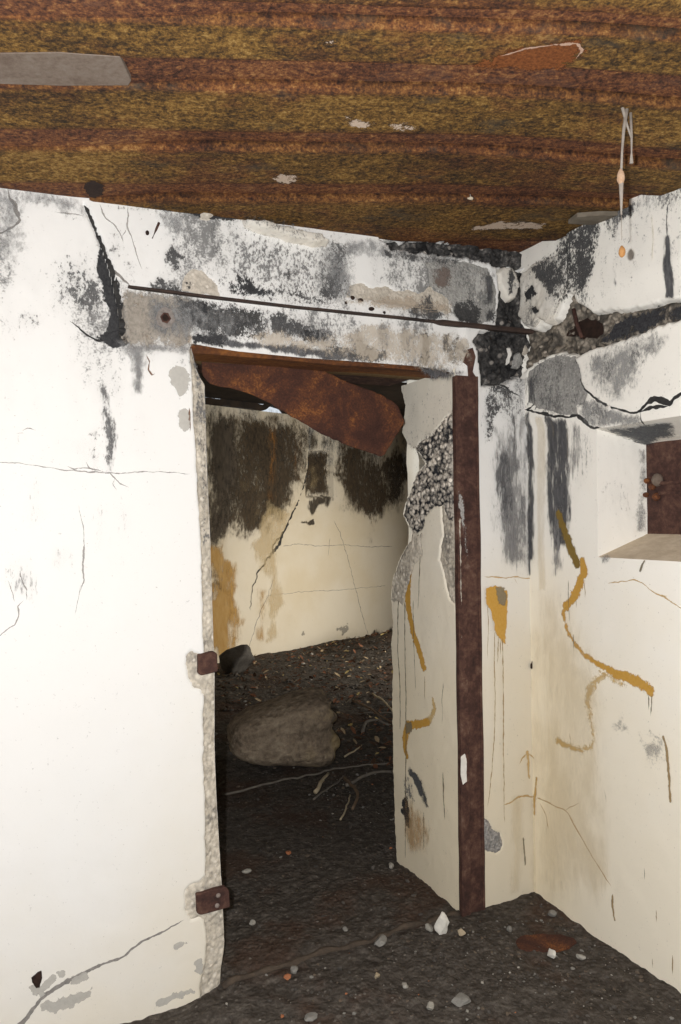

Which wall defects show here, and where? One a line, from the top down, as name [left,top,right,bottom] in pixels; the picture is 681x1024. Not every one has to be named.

leakage [57,211,496,390]
spalling [345,242,681,415]
leakage [556,189,681,309]
crack [1,462,184,487]
rust [201,362,404,456]
leakage [301,451,331,525]
crack [249,428,392,646]
spalling [391,414,468,605]
leakage [485,359,640,575]
crack [487,359,681,429]
crack [18,920,203,1024]